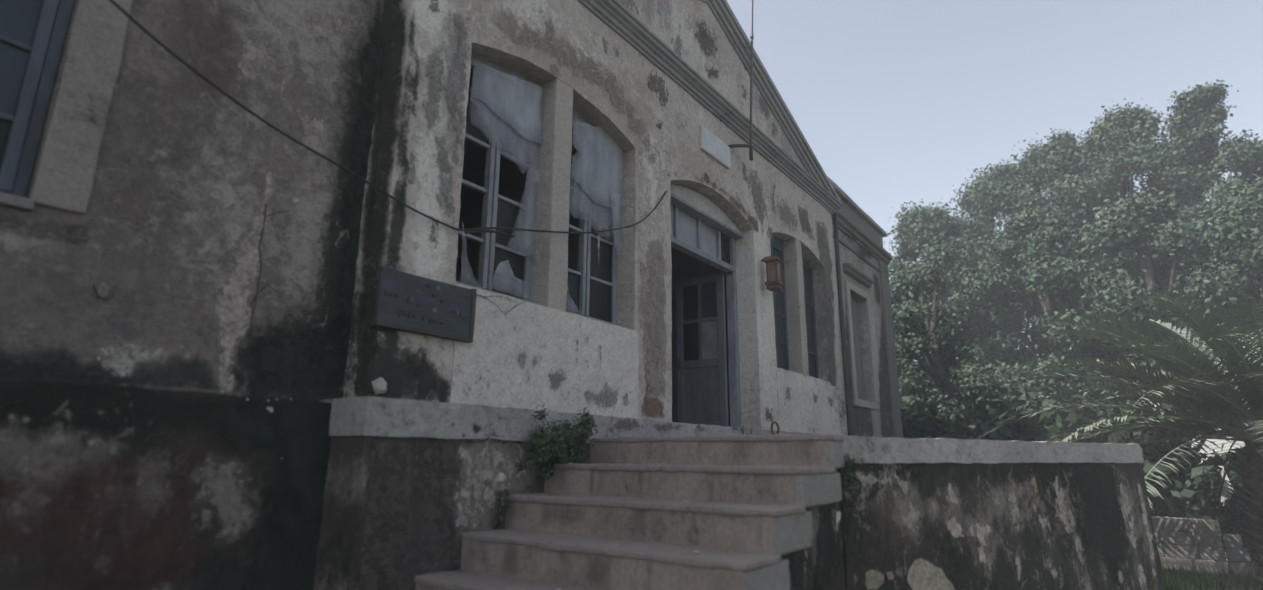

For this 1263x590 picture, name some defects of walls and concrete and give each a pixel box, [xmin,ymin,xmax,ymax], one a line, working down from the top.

crack [239,204,287,389]
damp [116,0,462,590]
spalling [865,558,955,590]